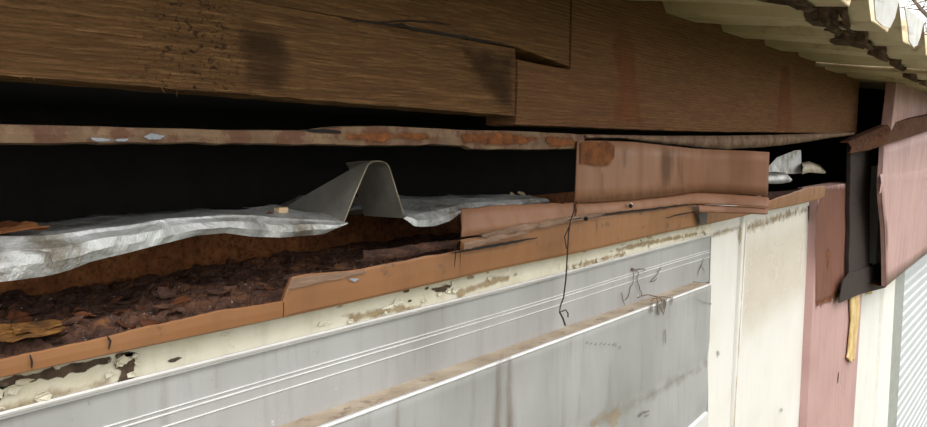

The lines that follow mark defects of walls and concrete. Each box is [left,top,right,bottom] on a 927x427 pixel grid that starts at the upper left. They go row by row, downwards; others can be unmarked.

crack [341,17,513,47]
rust [461,132,615,167]
peeling [464,212,606,250]
peeling [568,231,708,269]
peeling [289,270,366,289]
peeling [347,272,517,324]
peeling [0,352,142,410]